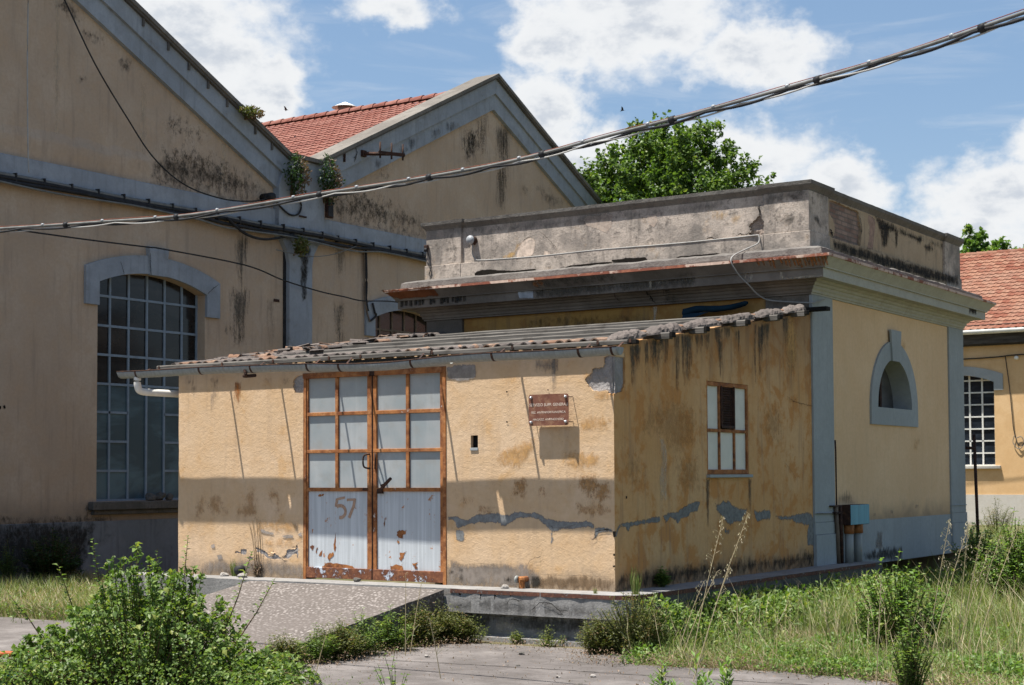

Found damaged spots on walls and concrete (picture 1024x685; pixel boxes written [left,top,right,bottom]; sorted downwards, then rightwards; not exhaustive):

leakage [155,155,248,193]
leakage [497,128,508,202]
leakage [834,216,958,284]
leakage [233,290,246,340]
leakage [630,328,740,378]
spalling [586,356,623,398]
peeling [235,545,299,560]
corrosion [310,534,354,568]
corrosion [390,530,418,570]